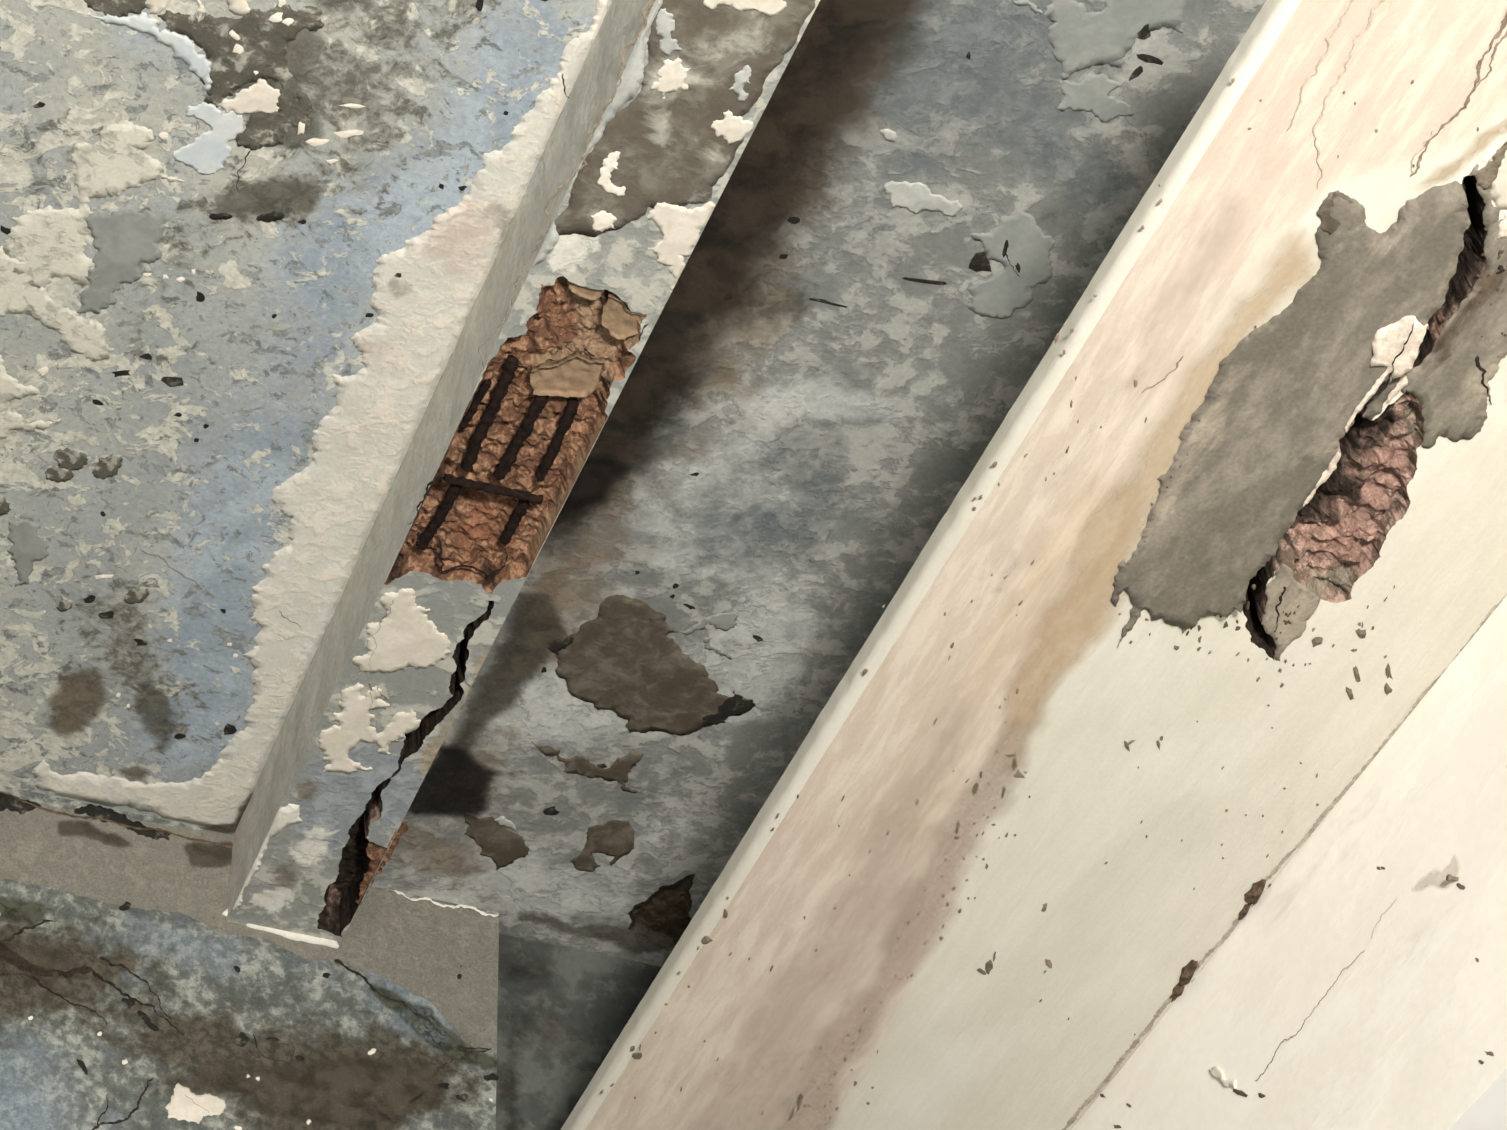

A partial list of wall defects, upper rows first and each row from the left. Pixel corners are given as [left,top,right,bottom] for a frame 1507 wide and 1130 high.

peeling [1014,0,1188,123]
peeling [532,0,815,294]
peeling [0,0,648,827]
spalling [1111,164,1507,661]
leakage [454,595,563,754]
peeling [548,595,755,736]
leakage [0,898,48,923]
crack [0,903,184,1036]
crack [92,1077,154,1130]
leakage [170,1061,443,1130]
crack [317,600,494,1085]
leakage [370,986,497,1068]